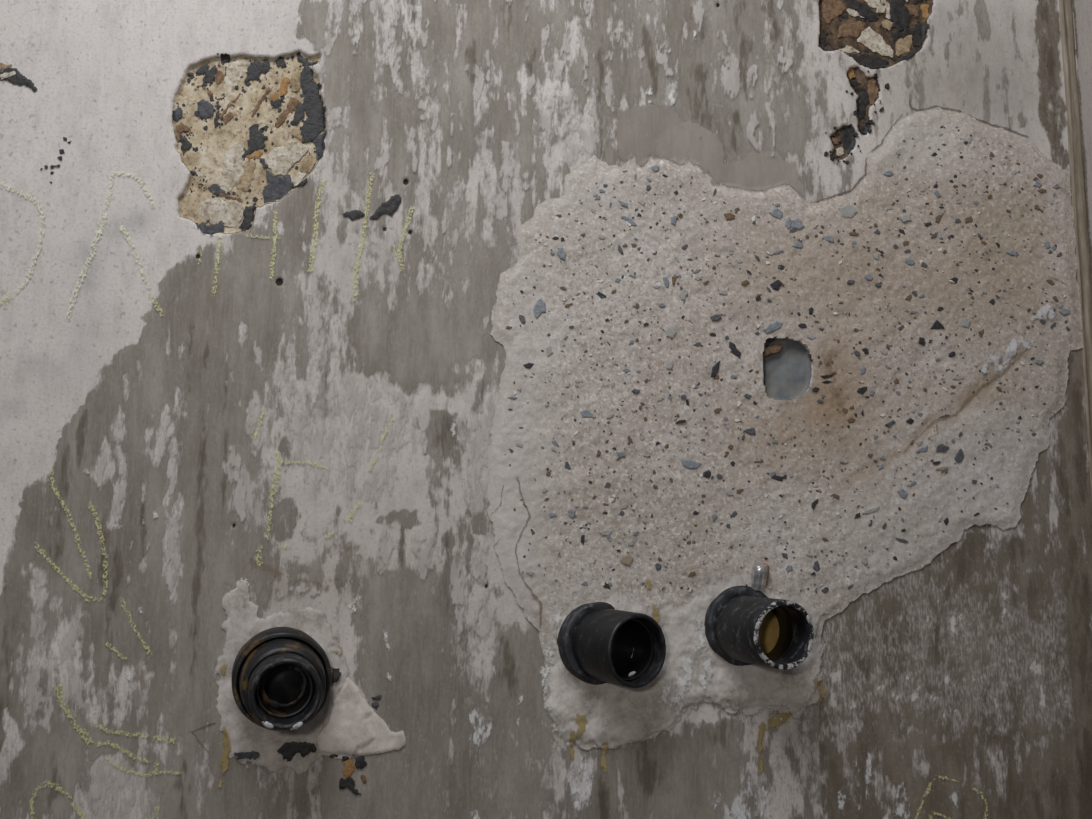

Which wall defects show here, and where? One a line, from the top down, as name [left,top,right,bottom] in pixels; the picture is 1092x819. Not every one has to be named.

spalling [0,62,37,92]
spalling [172,51,327,234]
leakage [0,0,854,819]
spalling [487,0,1084,714]
crack [904,351,1024,452]
leakage [981,337,1033,373]
leakage [1030,304,1055,321]
crack [491,477,542,627]
leakage [785,348,1092,819]